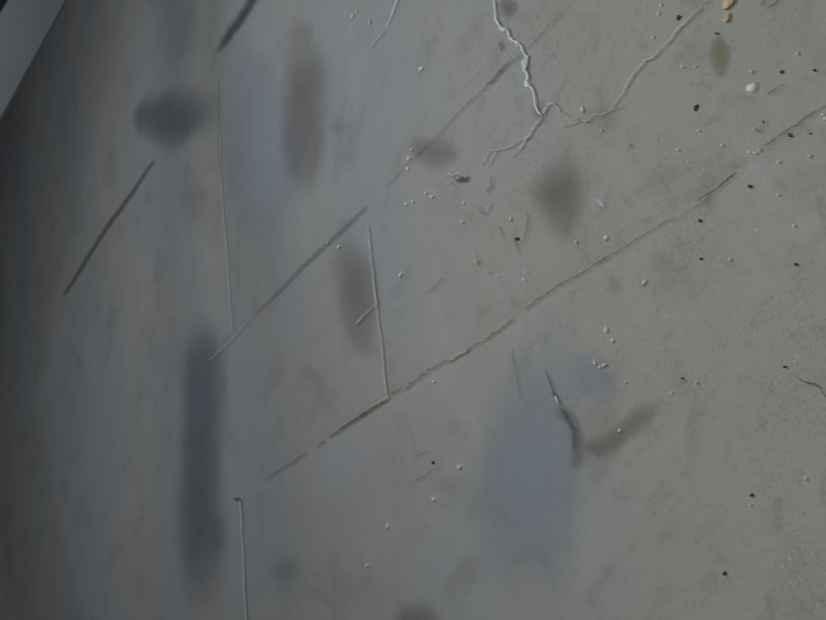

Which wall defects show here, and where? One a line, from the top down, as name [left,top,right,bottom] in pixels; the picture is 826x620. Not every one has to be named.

crack [480,0,708,165]
crack [699,172,736,200]
crack [330,226,409,437]
crack [546,373,560,404]